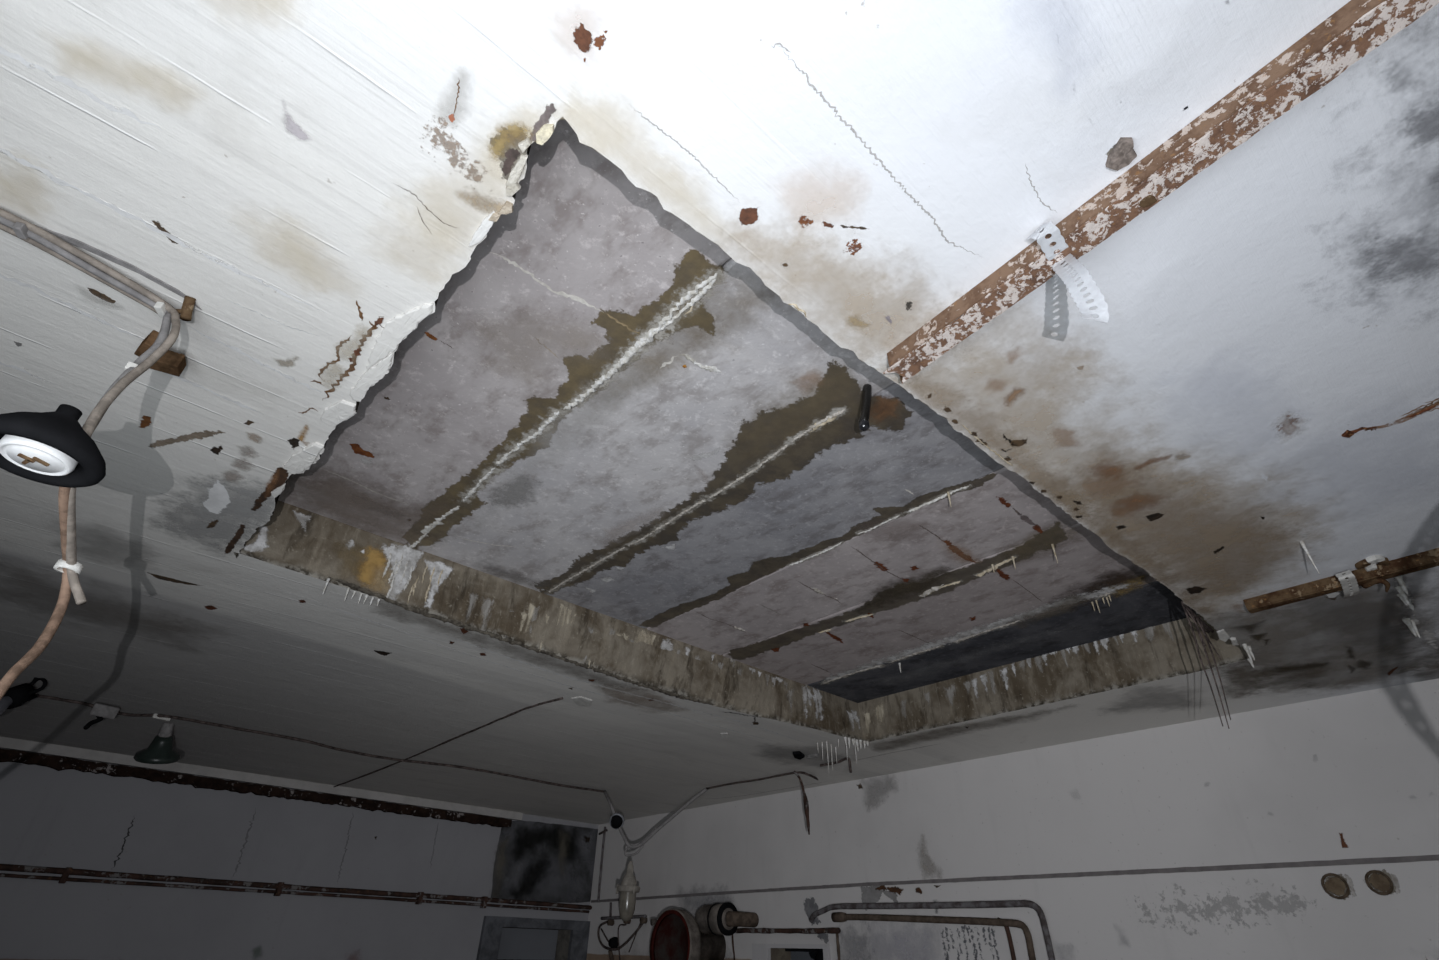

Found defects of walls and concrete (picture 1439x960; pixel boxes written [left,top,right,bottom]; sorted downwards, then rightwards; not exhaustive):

spalling [466,103,556,247]
crack [631,107,740,203]
crack [770,43,975,255]
peeling [148,303,433,554]
crack [230,300,384,414]
leakage [520,361,914,631]
leakage [616,409,1267,720]
corrosion [942,540,976,563]
spalling [971,432,1027,461]
corrosion [996,496,1043,534]
corrosion [1342,398,1439,438]
spalling [329,577,714,705]